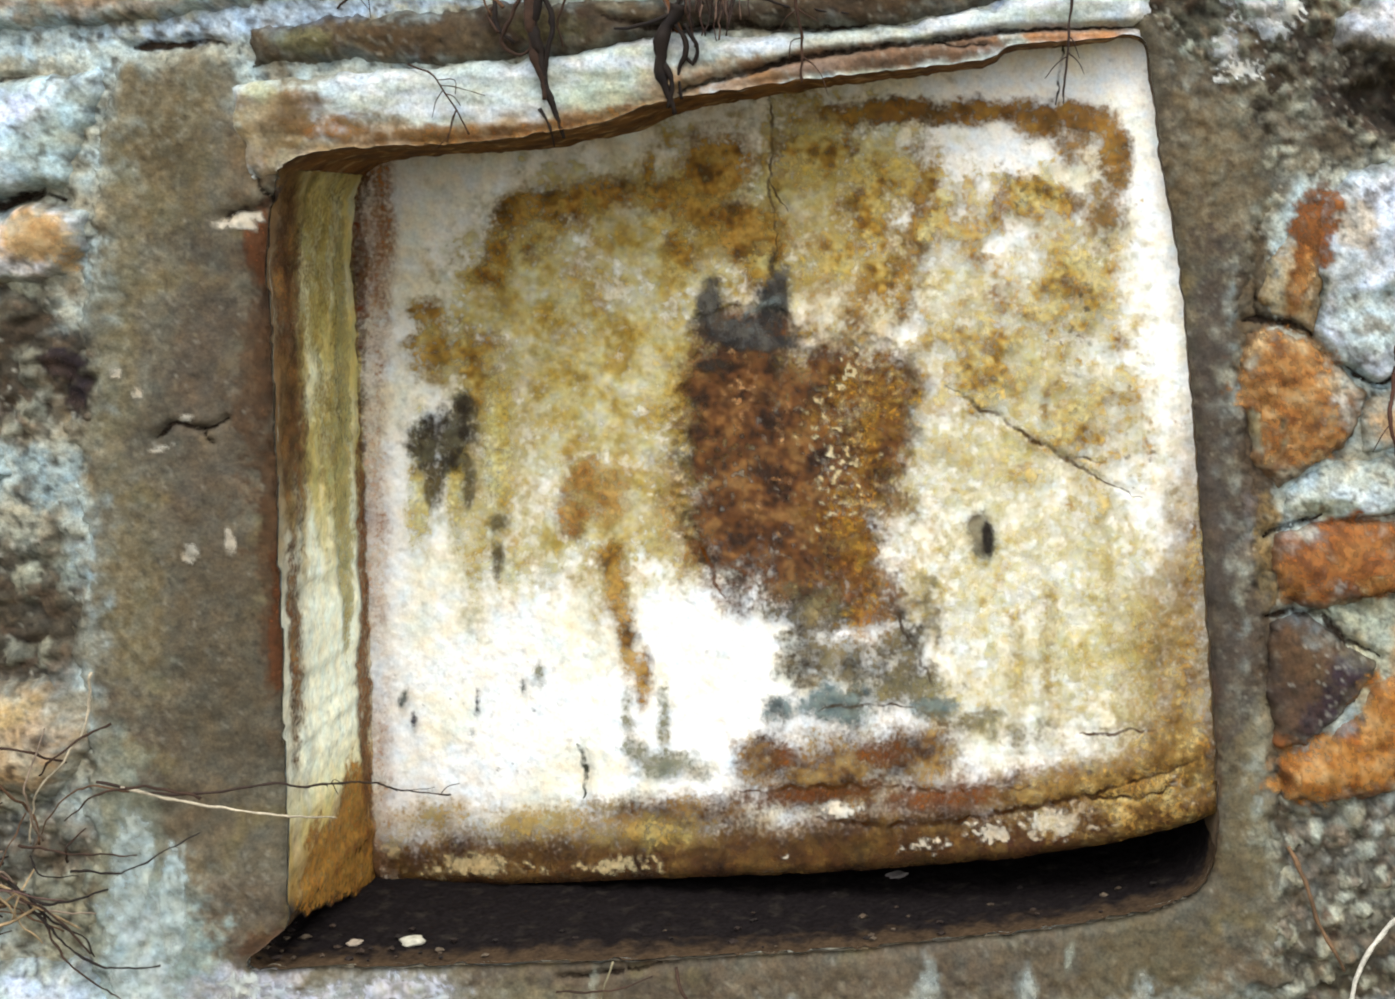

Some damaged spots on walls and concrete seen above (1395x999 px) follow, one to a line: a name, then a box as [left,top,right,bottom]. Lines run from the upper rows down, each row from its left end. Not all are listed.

crack [601,14,1135,277]
water stain [406,90,1200,763]
crack [944,384,1143,498]
water stain [398,690,417,727]
water stain [620,686,708,781]
crack [738,761,1192,829]